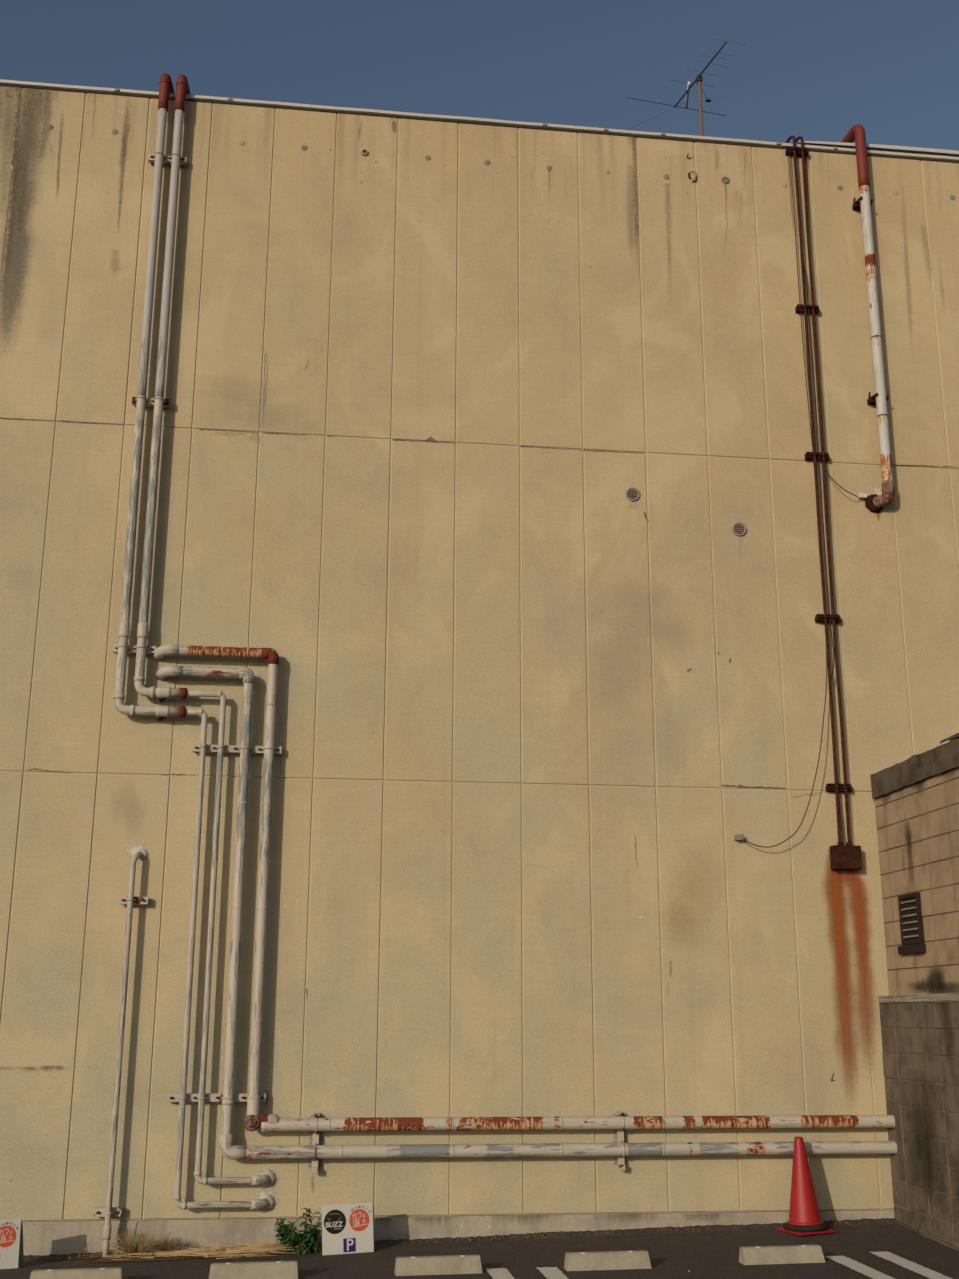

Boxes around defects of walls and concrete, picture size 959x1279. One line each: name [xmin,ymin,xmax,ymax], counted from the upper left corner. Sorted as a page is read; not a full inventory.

corrosion [827,862,870,1063]